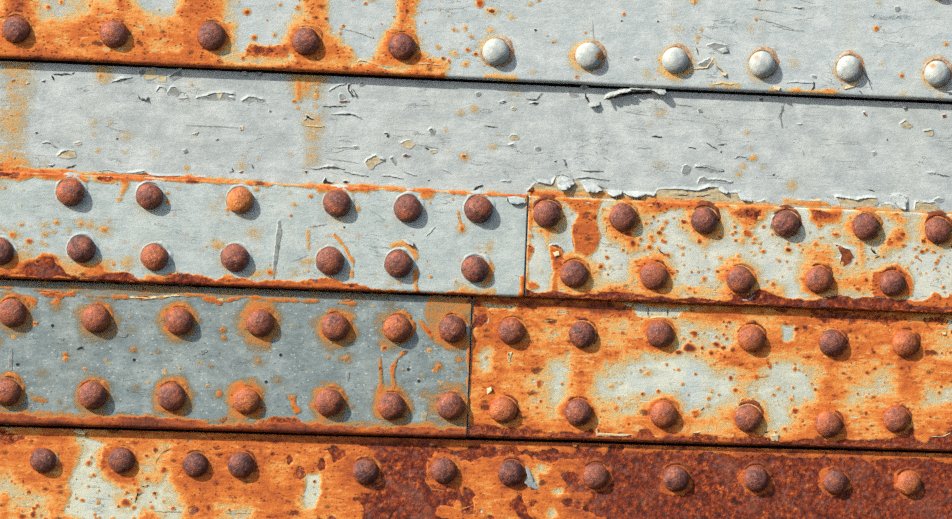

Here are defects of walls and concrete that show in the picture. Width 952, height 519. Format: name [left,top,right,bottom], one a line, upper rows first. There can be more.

peeling [137,67,183,97]
corrosion [0,0,458,140]
peeling [195,90,272,113]
peeling [338,80,366,119]
peeling [567,85,588,98]
peeling [589,87,666,107]
peeling [47,140,83,168]
peeling [352,131,416,171]
peeling [507,133,520,152]
peeling [506,159,770,206]
peeling [787,194,945,212]
corrosion [0,138,952,519]